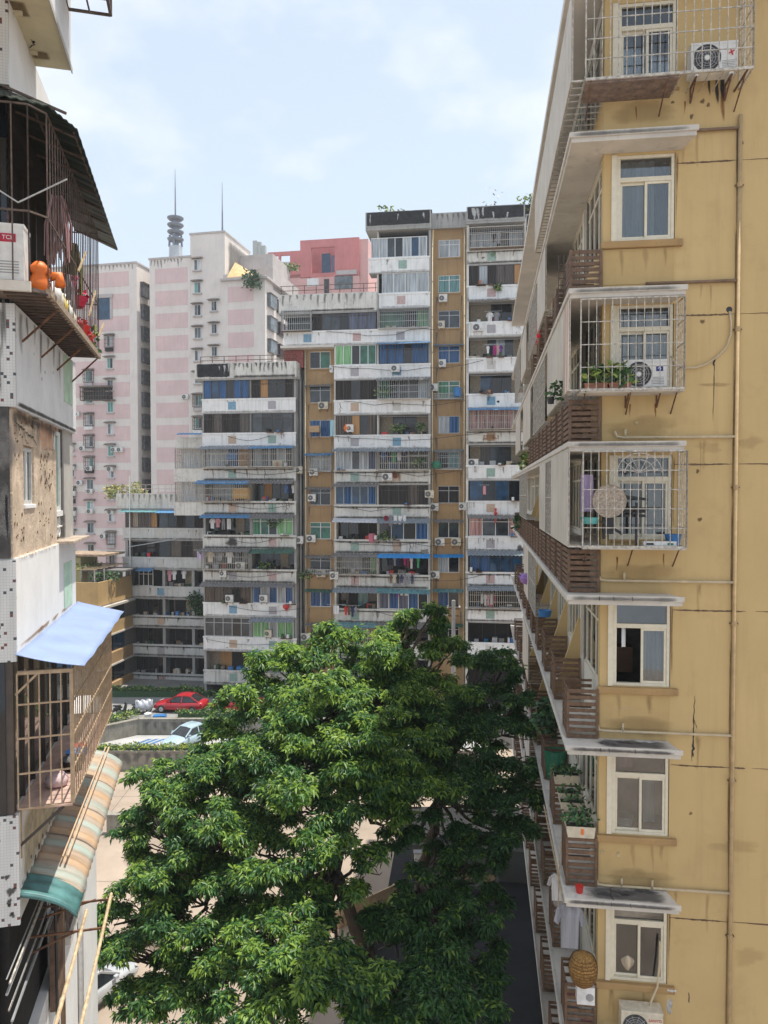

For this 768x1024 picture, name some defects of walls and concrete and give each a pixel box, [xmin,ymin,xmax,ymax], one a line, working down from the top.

rust [708,79,725,116]
flaking render [38,421,55,491]
flaking render [14,501,59,558]
water stain [599,740,662,749]
crack [690,696,698,757]
water stain [591,887,662,903]